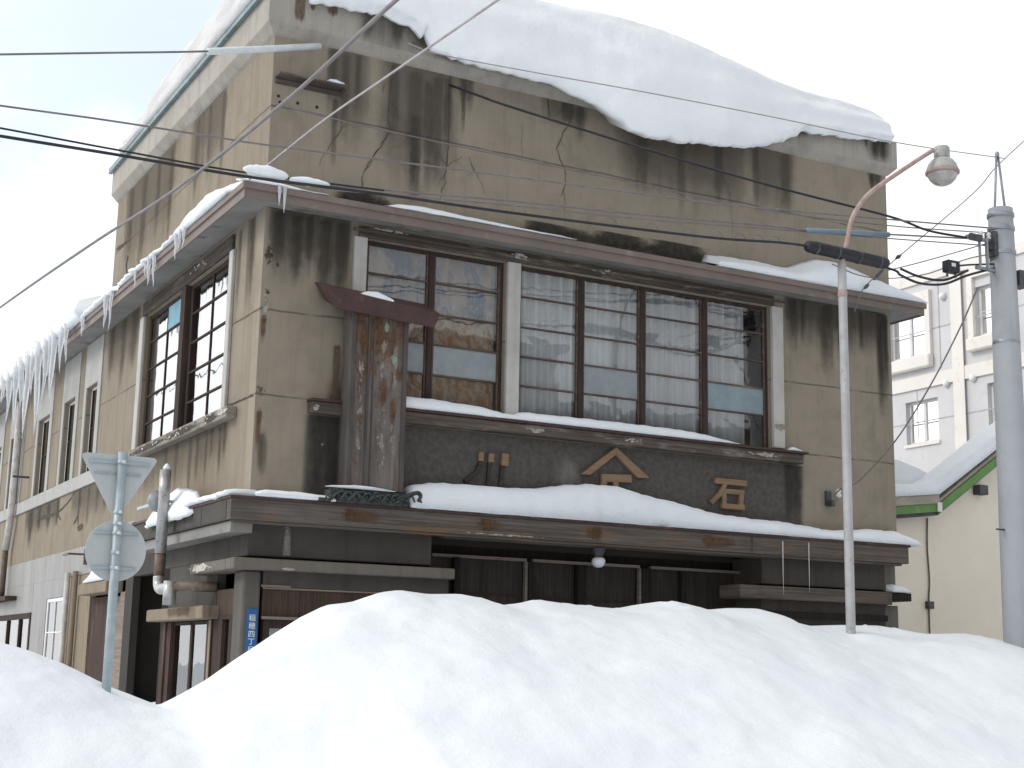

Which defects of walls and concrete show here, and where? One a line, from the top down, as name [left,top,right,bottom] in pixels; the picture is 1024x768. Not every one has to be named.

crack [361,62,399,187]
crack [435,75,485,198]
crack [548,98,574,222]
water stain [865,140,886,155]
water stain [272,208,350,281]
water stain [345,192,371,203]
water stain [530,221,571,237]
water stain [601,231,640,249]
water stain [786,296,888,382]